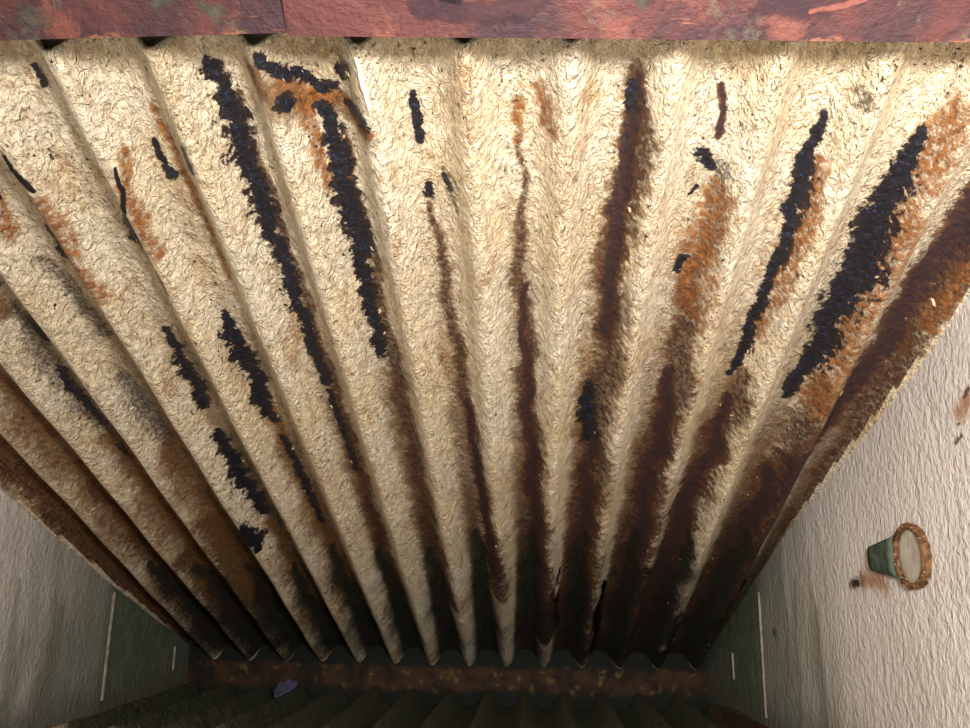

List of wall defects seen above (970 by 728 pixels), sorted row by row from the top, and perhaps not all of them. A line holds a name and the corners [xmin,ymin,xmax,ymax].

rust [410,0,544,25]
rust [756,0,868,20]
water stain [244,59,369,141]
rust [272,77,380,194]
rust [0,191,21,245]
rust [711,180,970,638]
rust [0,372,227,644]